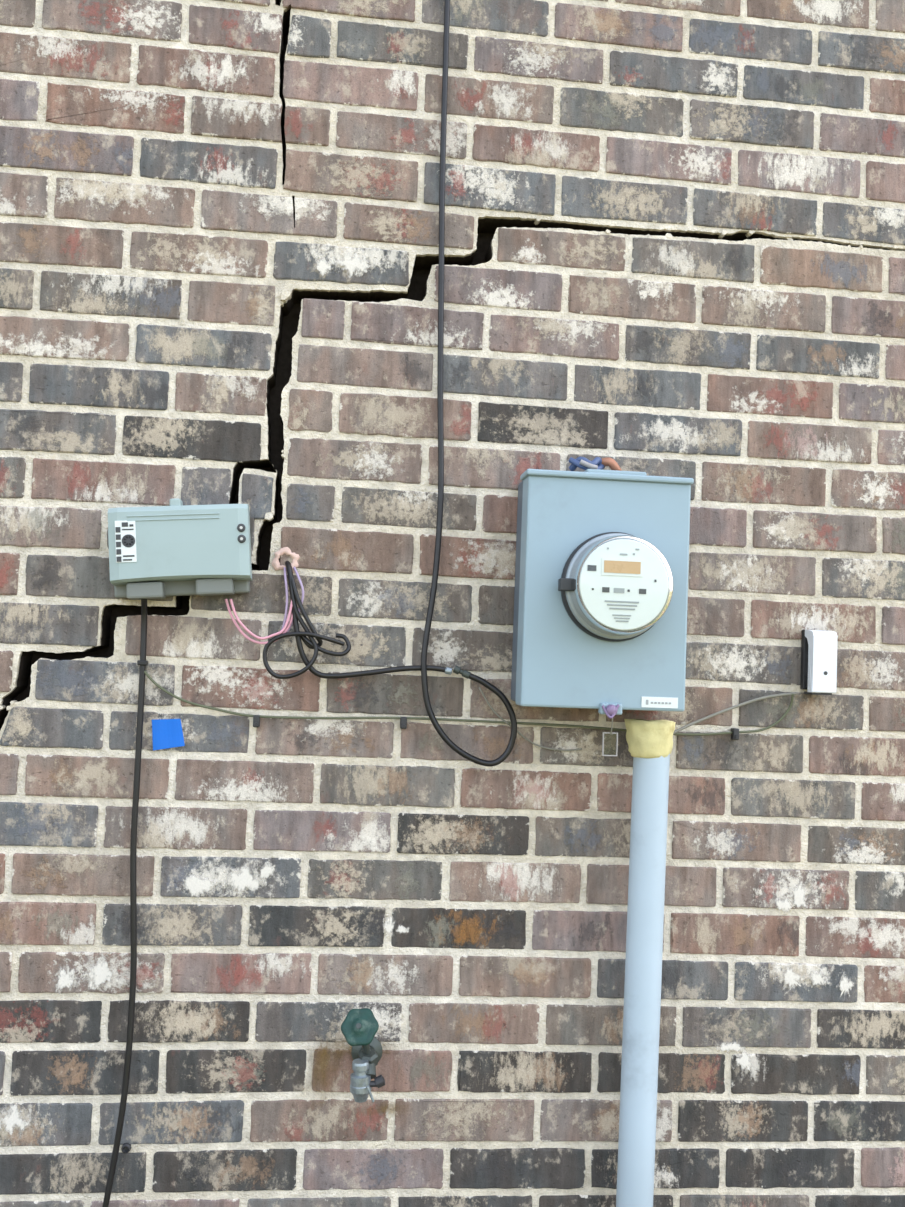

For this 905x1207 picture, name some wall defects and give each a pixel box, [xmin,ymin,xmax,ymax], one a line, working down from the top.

crack [276,0,295,227]
crack [229,218,903,571]
crack [0,596,190,730]